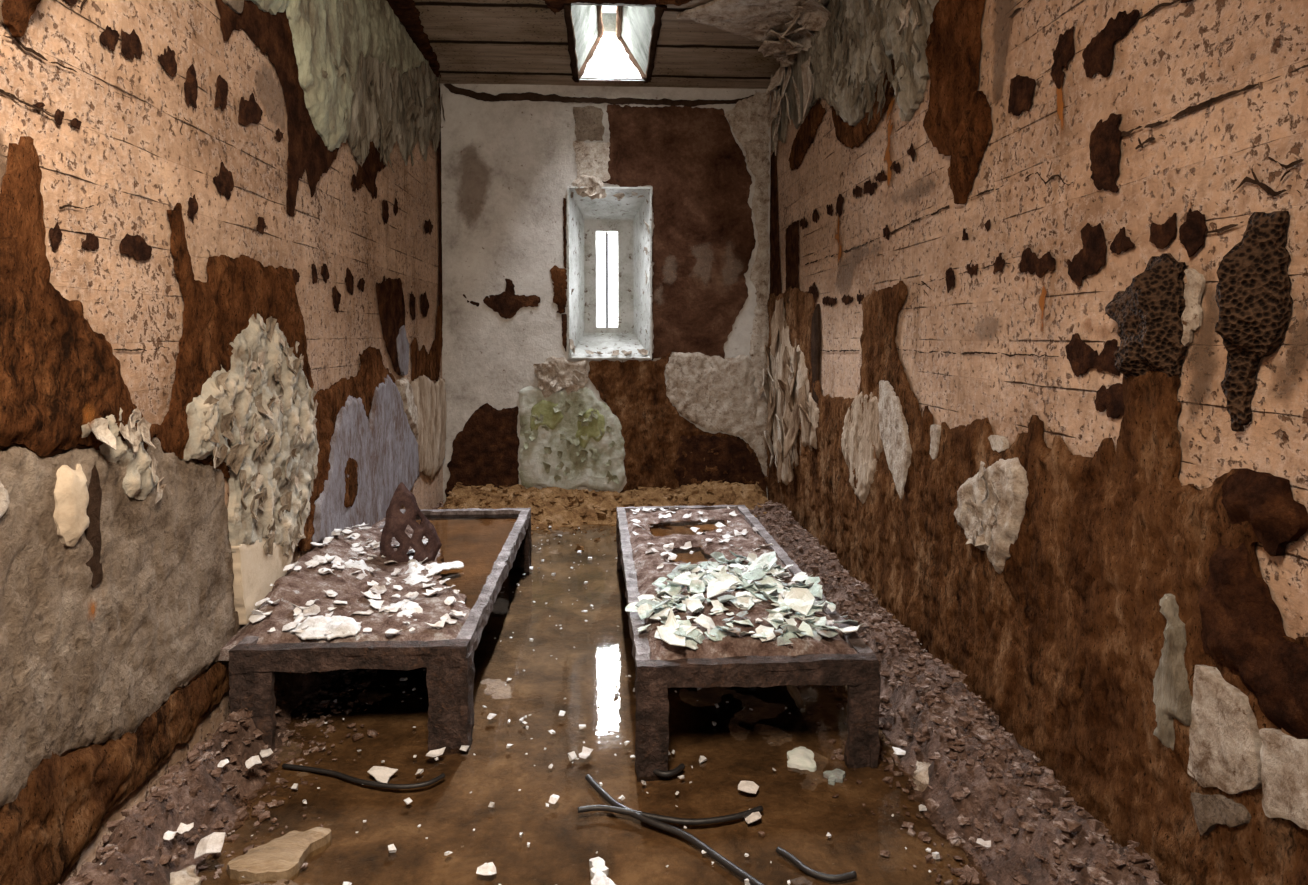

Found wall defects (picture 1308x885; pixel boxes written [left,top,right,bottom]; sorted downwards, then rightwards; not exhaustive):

flaking render [216,0,445,217]
crack [1121,65,1308,149]
flaking render [0,136,466,807]
spalling [445,0,1308,885]
flaking render [163,822,194,840]